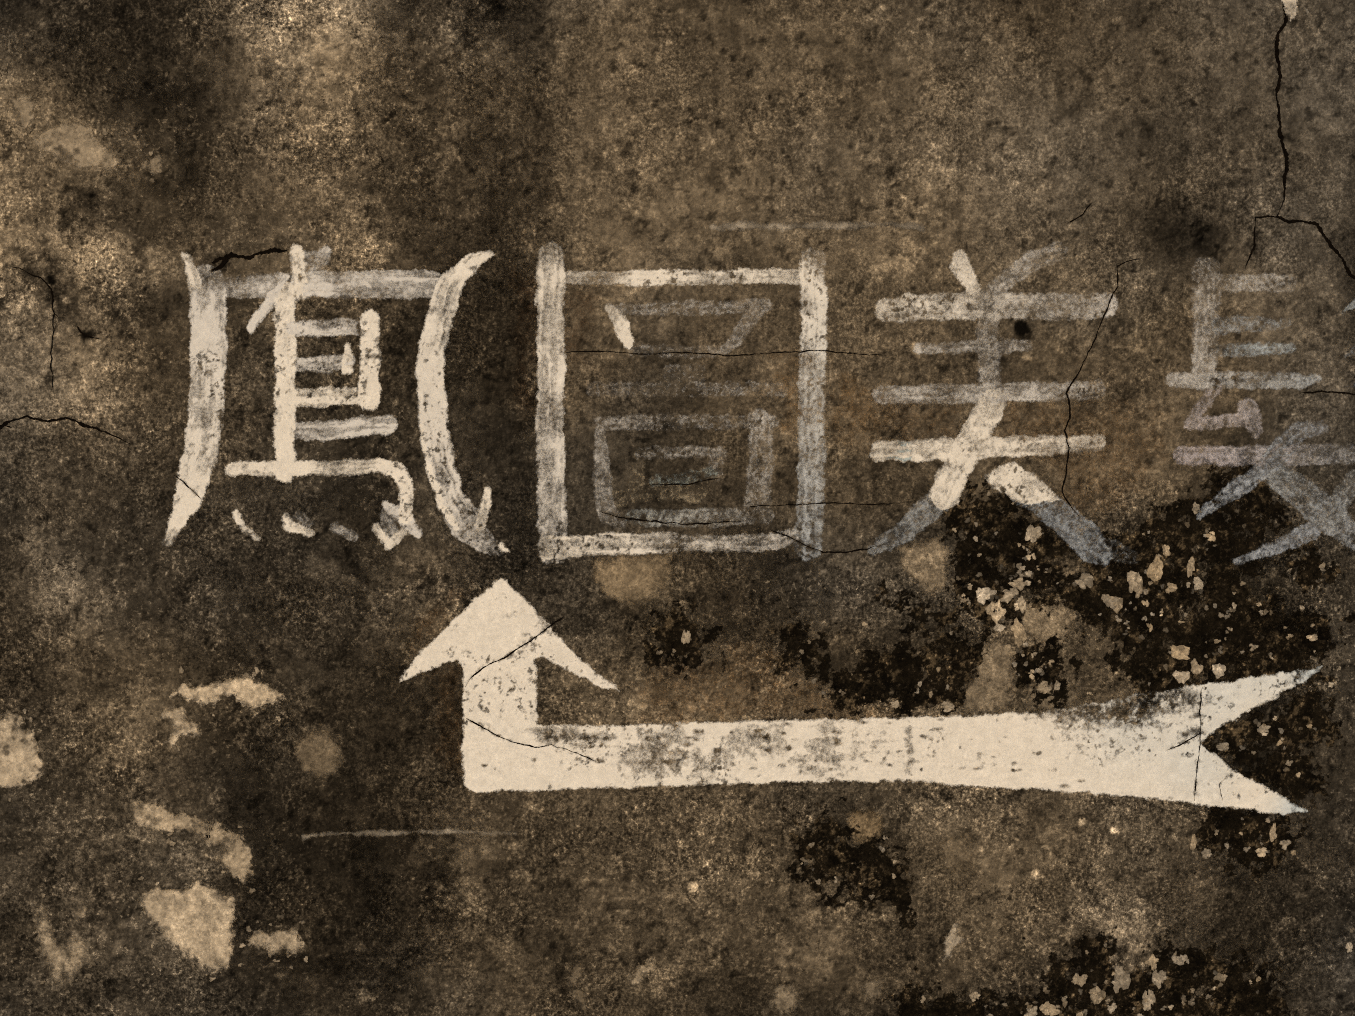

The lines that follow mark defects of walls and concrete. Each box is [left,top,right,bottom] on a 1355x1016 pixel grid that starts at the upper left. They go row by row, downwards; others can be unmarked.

damp [0,0,228,204]
crack [1245,1,1355,279]
crack [0,267,130,444]
damp [228,0,559,596]
crack [1302,388,1355,396]
spalling [0,708,48,802]
crack [465,616,594,761]
spalling [592,553,726,688]
peeling [770,449,1355,889]
spalling [130,801,308,982]
peeling [780,797,918,934]
peeling [860,924,1297,1016]